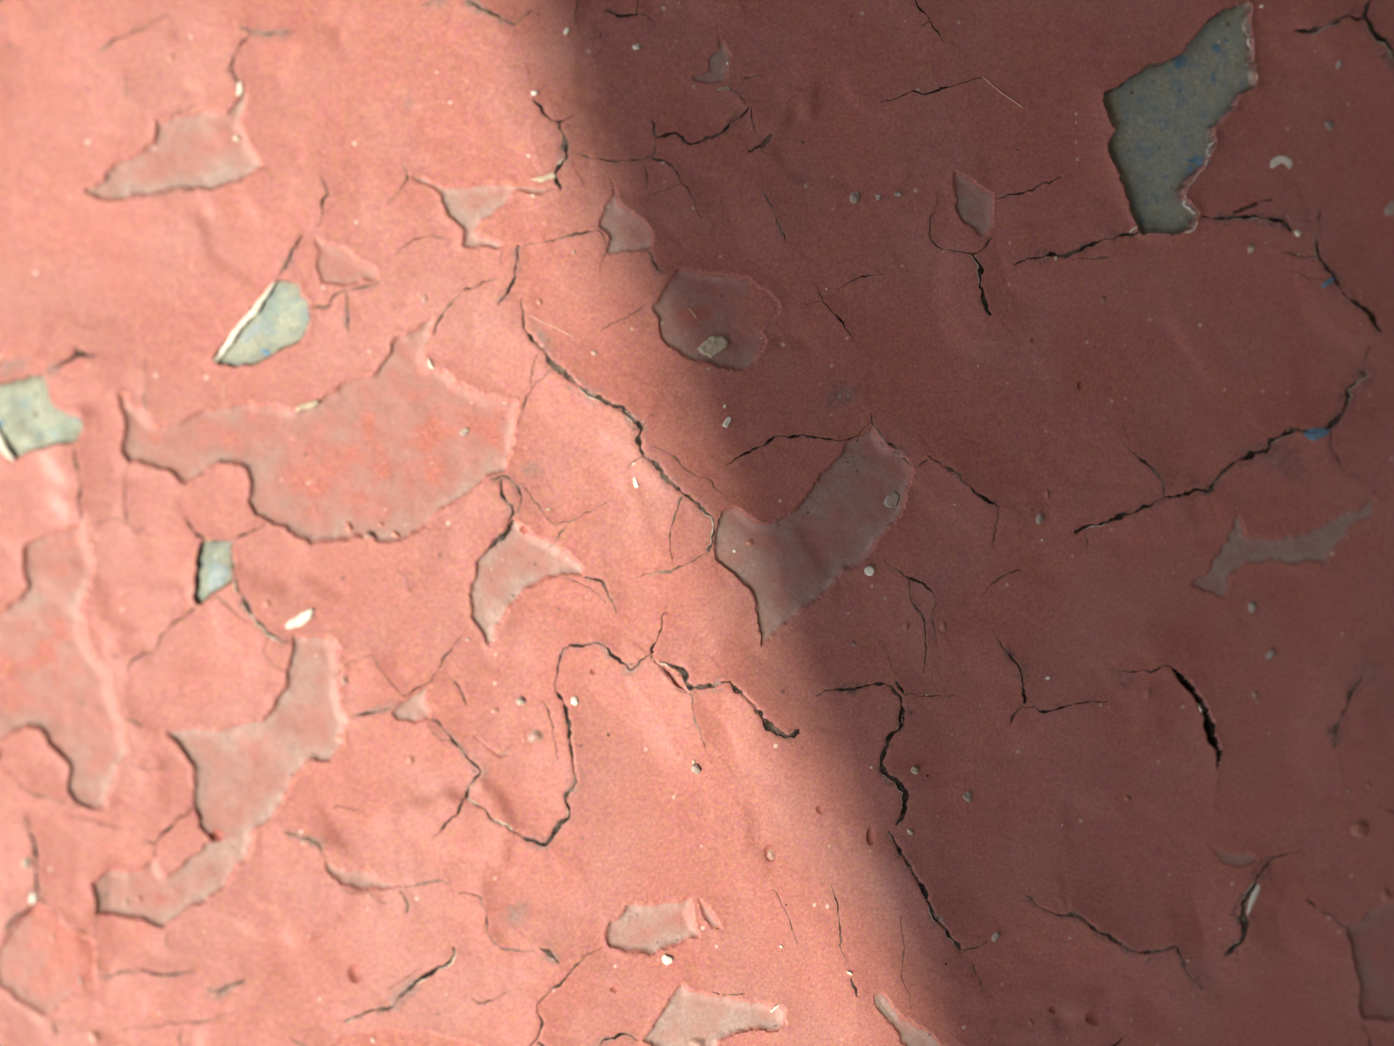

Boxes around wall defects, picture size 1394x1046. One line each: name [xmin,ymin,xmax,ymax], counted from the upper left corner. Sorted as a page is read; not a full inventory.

peeling [1103,2,1258,235]
peeling [0,374,84,462]
peeling [213,279,311,367]
crack [426,230,1022,614]
crack [1074,199,1382,548]
peeling [193,540,236,605]
peeling [469,519,585,646]
peeling [92,609,349,929]
crack [333,612,800,849]
crack [815,559,988,1009]
crack [343,879,602,1046]
crack [600,1033,639,1046]